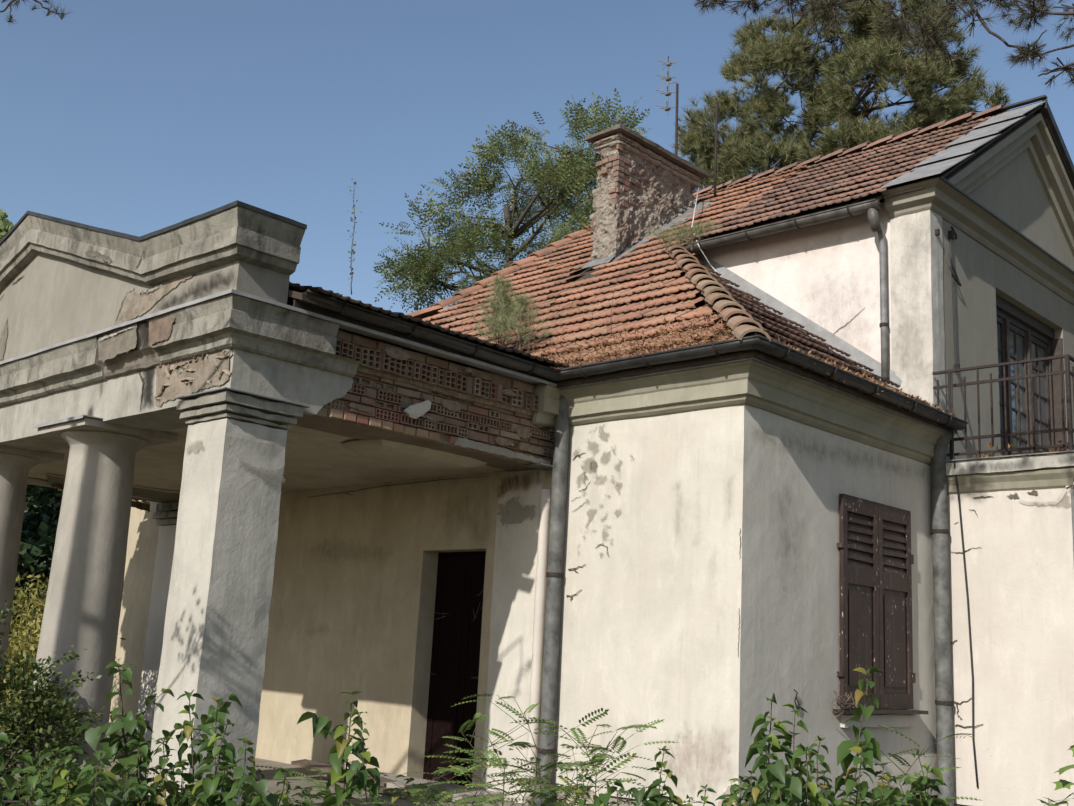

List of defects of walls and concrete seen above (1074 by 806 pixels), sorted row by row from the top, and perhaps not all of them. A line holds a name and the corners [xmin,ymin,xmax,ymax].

peeling [0,320,8,360]
peeling [98,273,195,362]
peeling [155,349,232,407]
spalling [312,330,555,465]
peeling [498,498,535,525]
peeling [573,426,632,539]
peeling [1006,482,1074,507]